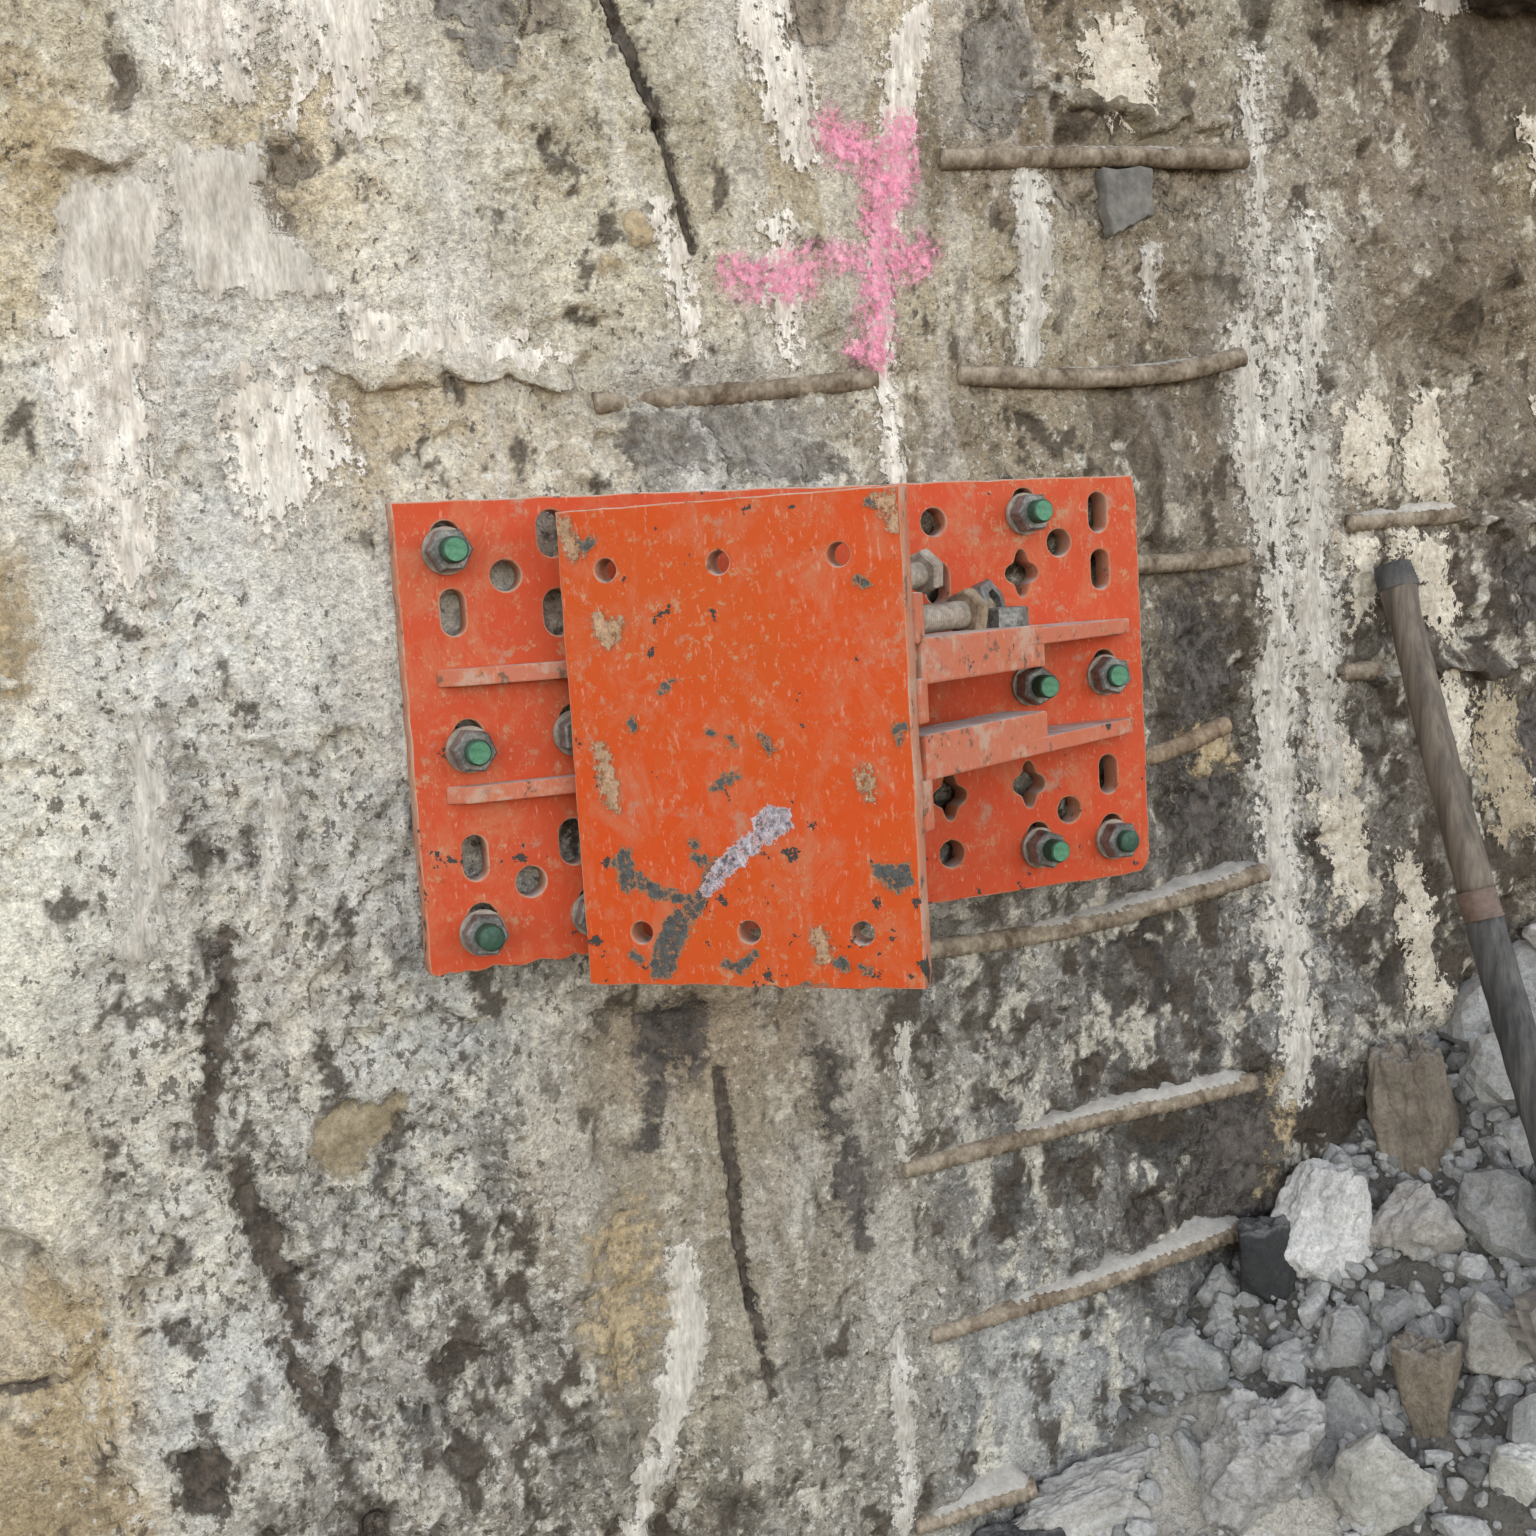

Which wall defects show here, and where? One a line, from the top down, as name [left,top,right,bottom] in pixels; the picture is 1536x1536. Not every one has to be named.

crack [600,0,698,255]
spalling [939,0,1250,240]
spalling [956,347,1248,389]
spalling [1138,545,1250,575]
peeling [889,721,909,748]
spalling [1146,716,1232,766]
rust [1174,723,1241,777]
peeling [869,856,916,896]
spalling [930,860,1271,960]
spalling [903,1068,1259,1179]
crack [712,1066,779,1401]
spalling [930,1215,1239,1345]